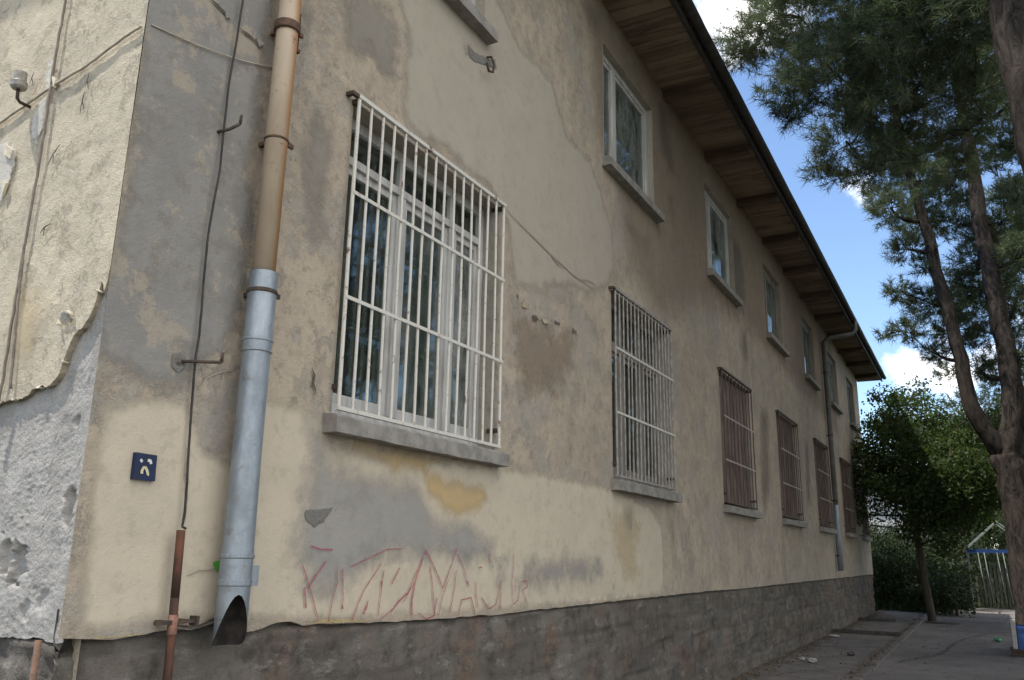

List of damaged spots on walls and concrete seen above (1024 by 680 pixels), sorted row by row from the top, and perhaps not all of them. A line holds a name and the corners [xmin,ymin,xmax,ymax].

flaking render [0,289,107,643]
flaking render [305,508,332,527]